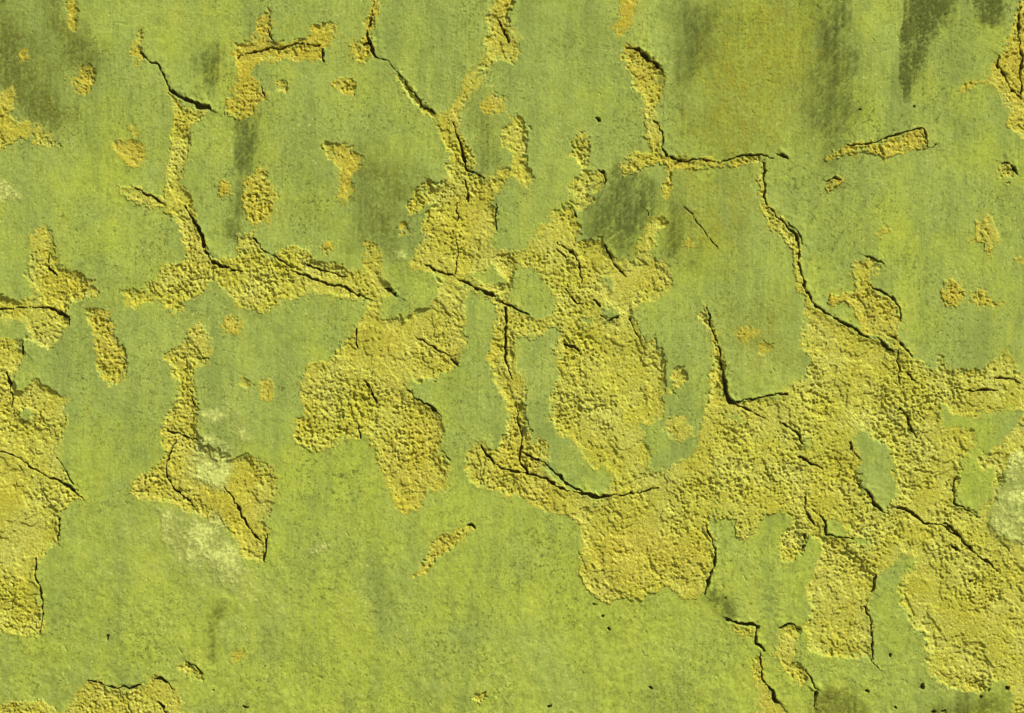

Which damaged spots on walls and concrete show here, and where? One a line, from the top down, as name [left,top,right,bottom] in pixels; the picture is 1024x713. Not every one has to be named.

leakage [900,0,955,96]
leakage [974,0,1003,26]
crack [363,1,529,379]
spalling [112,0,595,563]
crack [653,121,937,439]
spalling [0,224,130,638]
spalling [413,523,476,578]
crack [481,405,659,500]
crack [706,307,823,470]
spalling [509,43,1024,713]
crack [850,446,1010,572]
spalling [0,661,215,713]